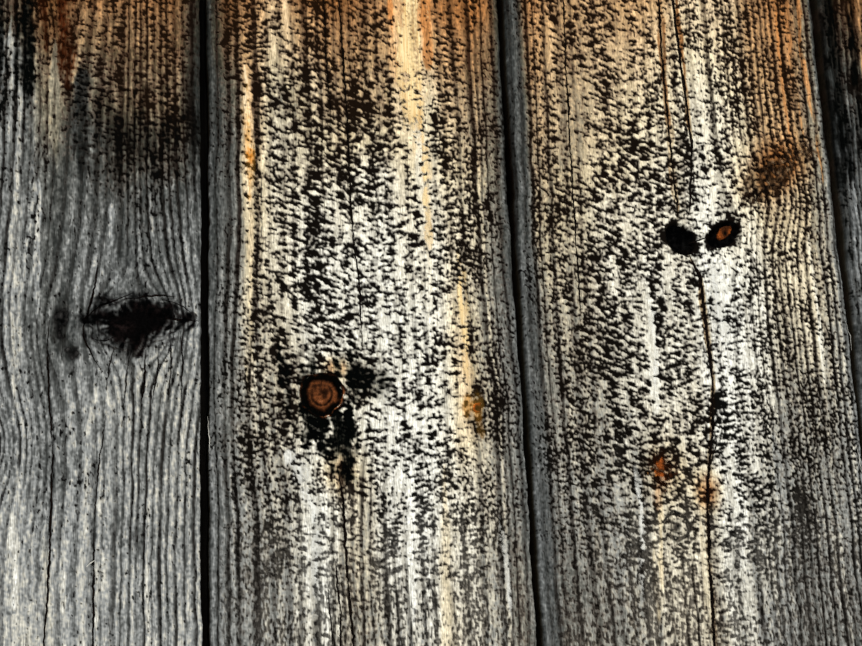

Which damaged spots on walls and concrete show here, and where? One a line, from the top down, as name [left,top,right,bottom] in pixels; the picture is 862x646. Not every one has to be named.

crack [658,0,693,217]
crack [688,236,717,646]